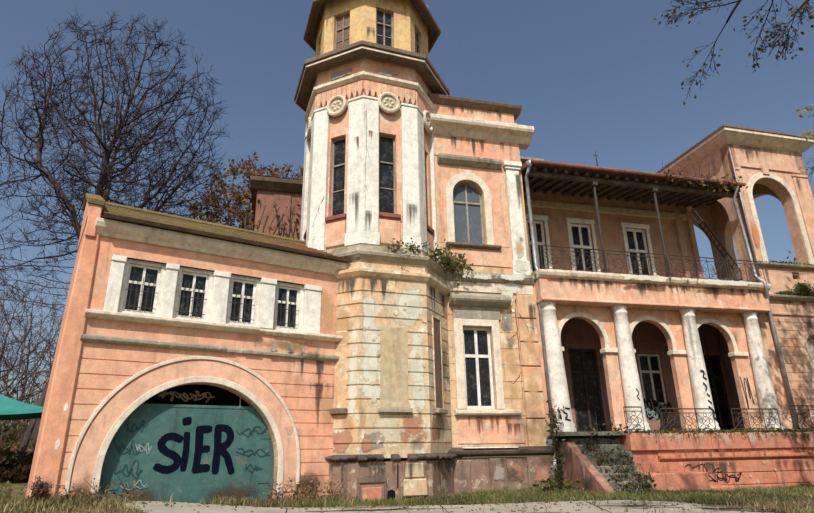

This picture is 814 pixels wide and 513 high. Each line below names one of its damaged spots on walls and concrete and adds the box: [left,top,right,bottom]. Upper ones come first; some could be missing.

damp [349,193,371,227]
damp [570,279,620,288]
damp [637,283,687,293]
damp [321,293,349,344]
peeling [348,284,440,452]
damp [315,361,331,418]
spalling [333,429,352,453]